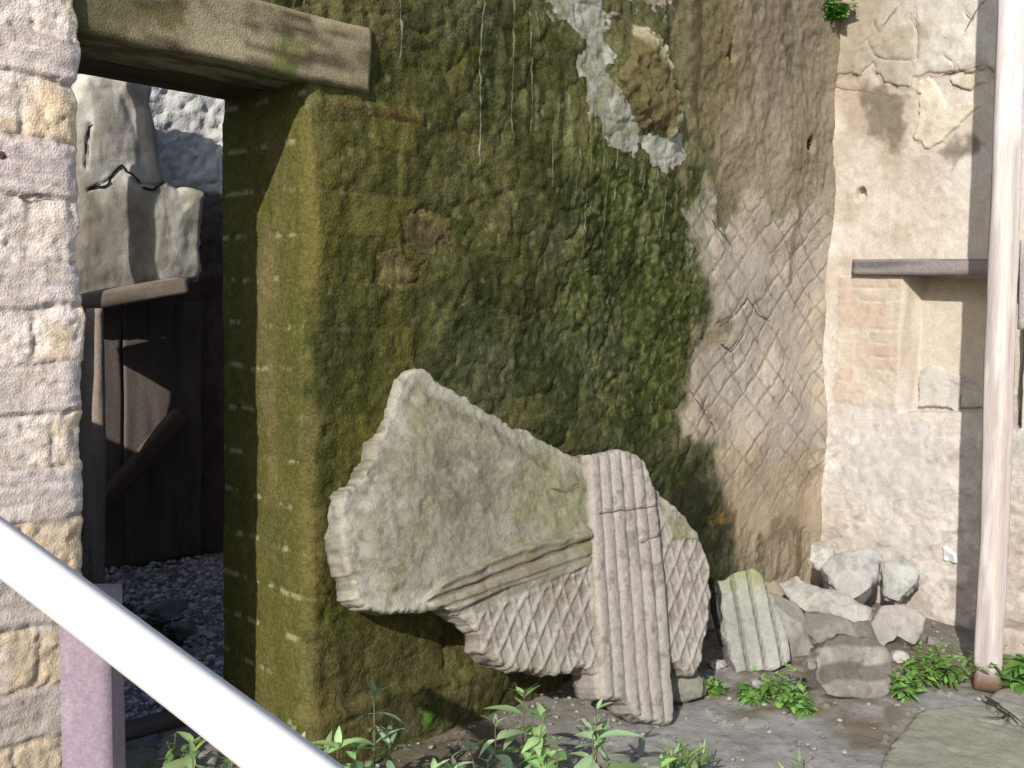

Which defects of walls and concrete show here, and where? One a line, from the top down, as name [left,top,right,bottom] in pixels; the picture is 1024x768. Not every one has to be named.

flaking render [629,0,673,18]
crack [874,8,919,60]
crack [943,56,983,75]